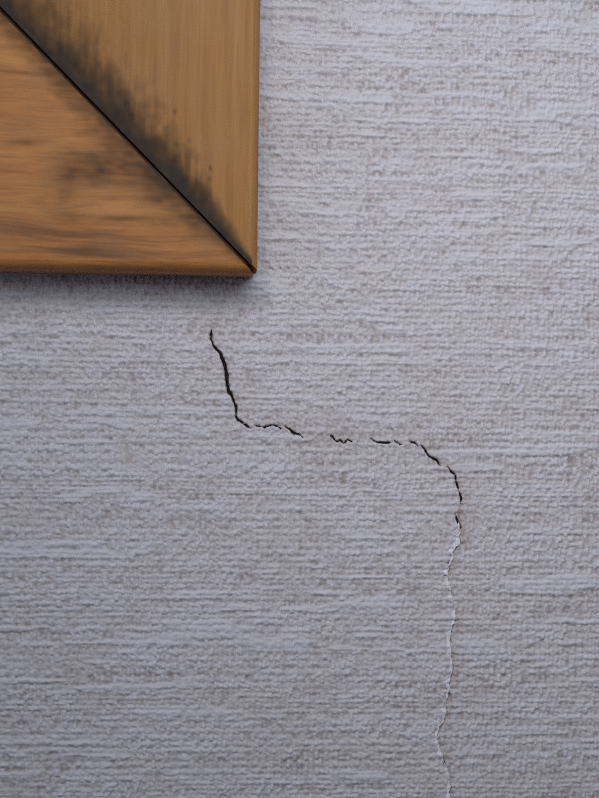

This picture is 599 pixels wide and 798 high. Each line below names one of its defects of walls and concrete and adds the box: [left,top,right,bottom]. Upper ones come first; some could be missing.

crack [209,330,303,438]
crack [330,435,462,798]